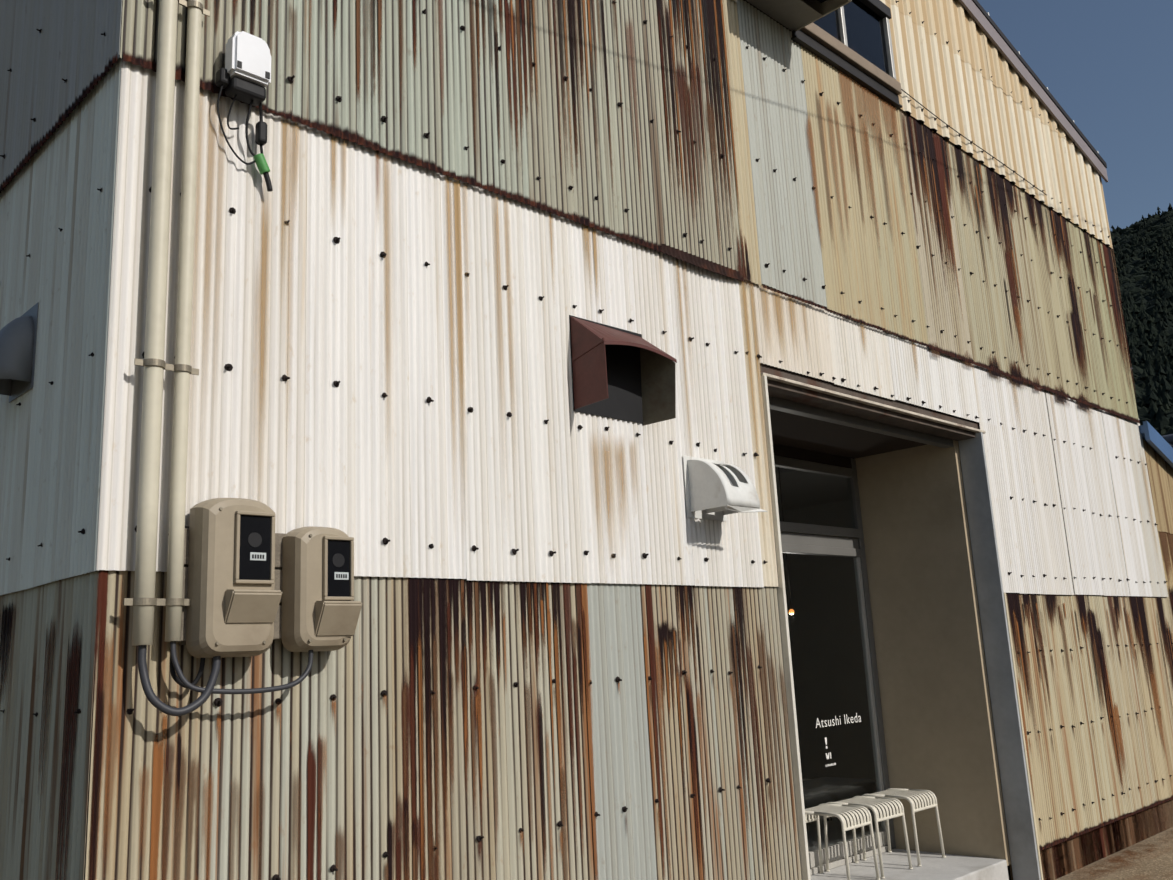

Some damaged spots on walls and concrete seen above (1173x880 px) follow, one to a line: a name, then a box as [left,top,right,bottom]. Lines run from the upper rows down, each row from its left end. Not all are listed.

rust [214,0,255,35]
rust [200,79,676,258]
rust [476,0,537,146]
rust [553,0,641,186]
rust [657,0,739,241]
rust [736,111,1140,423]
rust [39,570,114,880]
rust [384,577,506,880]
rust [644,584,714,875]
rust [730,587,784,858]
rust [1007,531,1173,803]
rust [1039,781,1173,880]